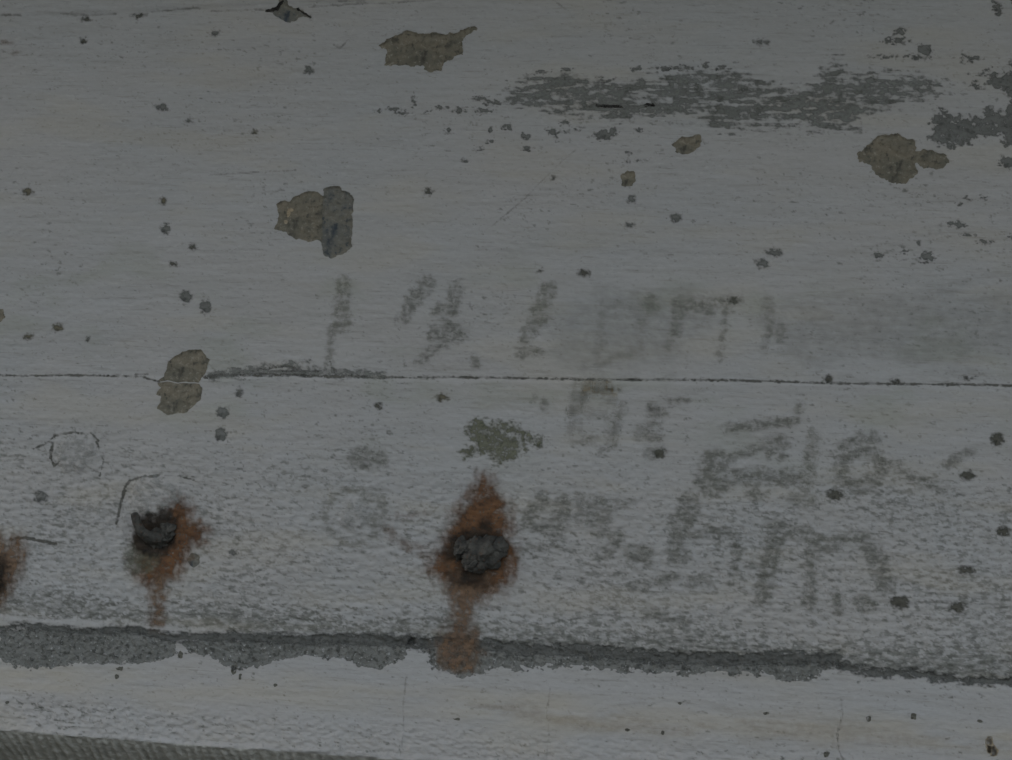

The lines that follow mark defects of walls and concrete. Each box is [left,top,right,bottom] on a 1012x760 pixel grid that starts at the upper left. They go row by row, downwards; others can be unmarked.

spalling [265,0,312,23]
spalling [379,26,477,72]
peeling [377,54,942,140]
spalling [857,54,1012,184]
spalling [274,186,354,258]
crack [6,374,158,382]
spalling [156,349,385,415]
crack [204,361,1012,387]
rust [0,536,26,606]
rust [125,500,205,626]
rust [428,475,518,671]
peeling [0,627,833,682]